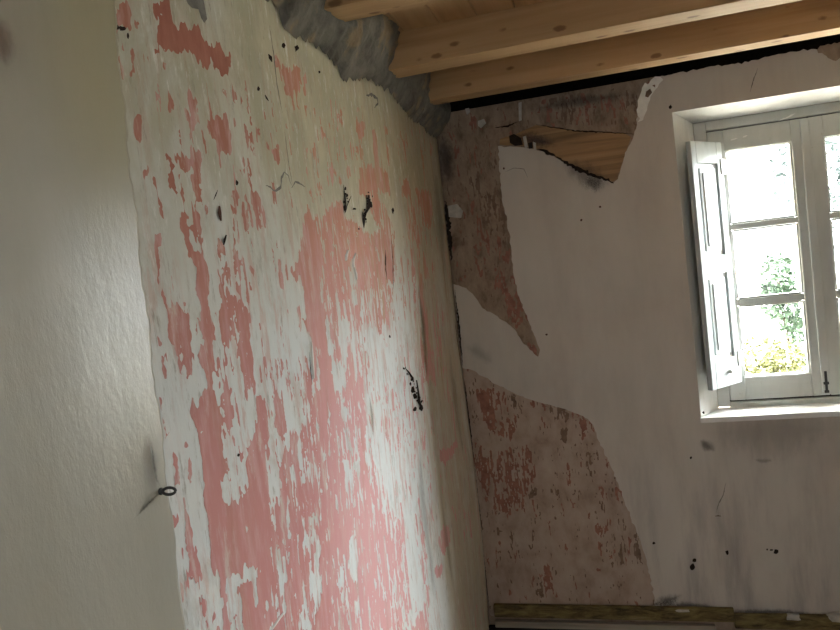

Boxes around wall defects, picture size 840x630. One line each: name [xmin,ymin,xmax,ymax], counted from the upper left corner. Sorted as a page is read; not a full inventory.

peeling [116,0,231,80]
peeling [133,114,142,143]
peeling [143,165,164,219]
crack [266,136,305,192]
peeling [154,0,663,630]